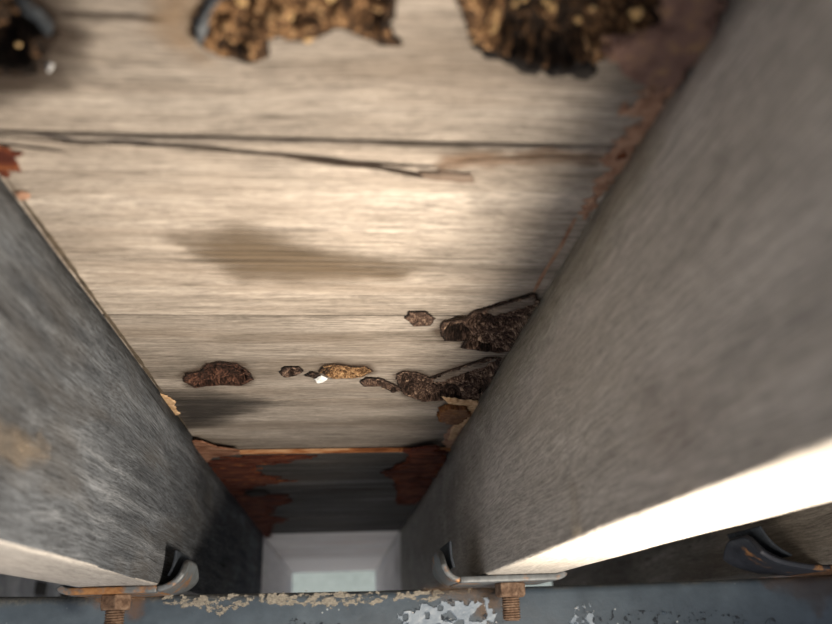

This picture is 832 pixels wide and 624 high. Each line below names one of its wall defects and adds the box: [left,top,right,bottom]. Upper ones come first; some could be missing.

spalling [15,0,54,37]
spalling [194,0,220,44]
crack [0,136,603,183]
damp [179,231,411,281]
peeling [397,597,503,624]
peeling [569,603,614,624]